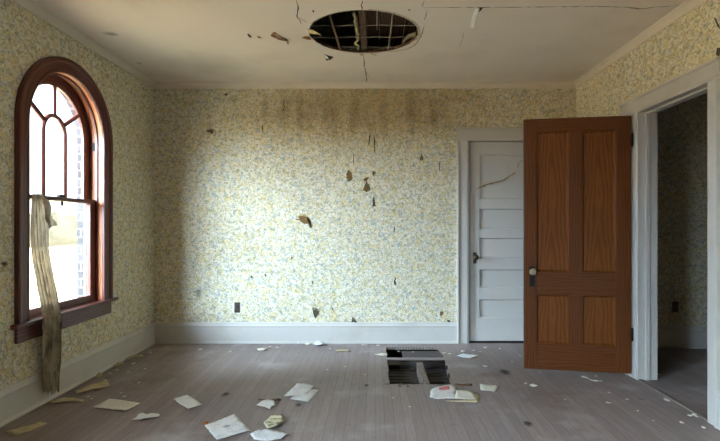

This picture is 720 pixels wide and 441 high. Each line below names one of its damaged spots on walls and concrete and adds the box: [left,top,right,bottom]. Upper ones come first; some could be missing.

crack [422,0,675,20]
crack [476,160,523,189]